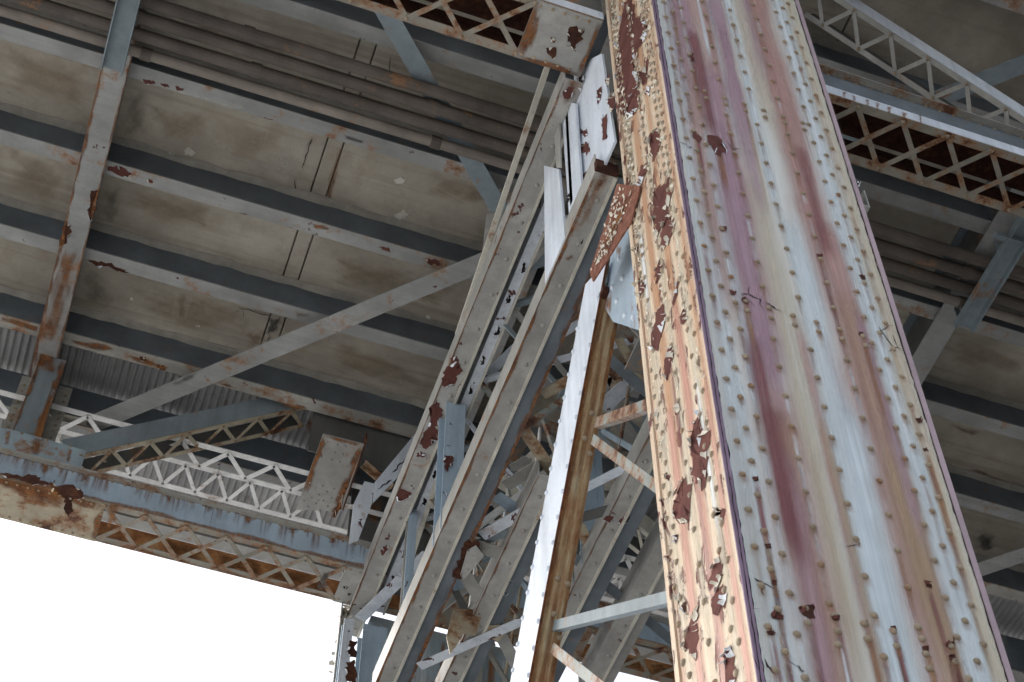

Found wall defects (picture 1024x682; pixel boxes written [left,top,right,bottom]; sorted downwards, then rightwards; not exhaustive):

peeling [546,26,585,60]
corrosion [0,8,599,616]
peeling [417,399,454,479]
peeling [441,356,473,394]
corrosion [376,174,611,682]
corrosion [562,433,650,618]
peeling [591,0,711,544]
corrosion [633,84,693,491]
peeling [674,557,727,661]
peeling [718,645,736,682]
corrosion [673,0,851,682]
corrosion [744,0,962,682]